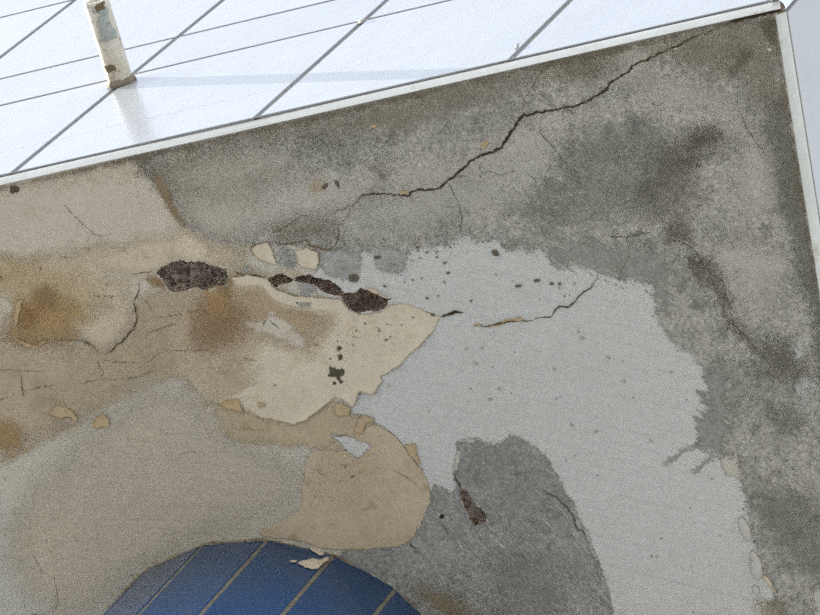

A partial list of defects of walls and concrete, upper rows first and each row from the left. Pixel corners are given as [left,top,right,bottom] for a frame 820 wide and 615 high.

crack [303,9,782,251]
water stain [0,251,337,468]
peeling [251,242,277,265]
peeling [144,259,440,425]
peeling [295,248,329,270]
water stain [132,15,820,449]
crack [431,232,649,328]
crack [665,241,765,358]
peeling [331,415,374,459]
peeling [339,434,613,615]
water stain [406,537,586,615]
water stain [746,468,820,590]